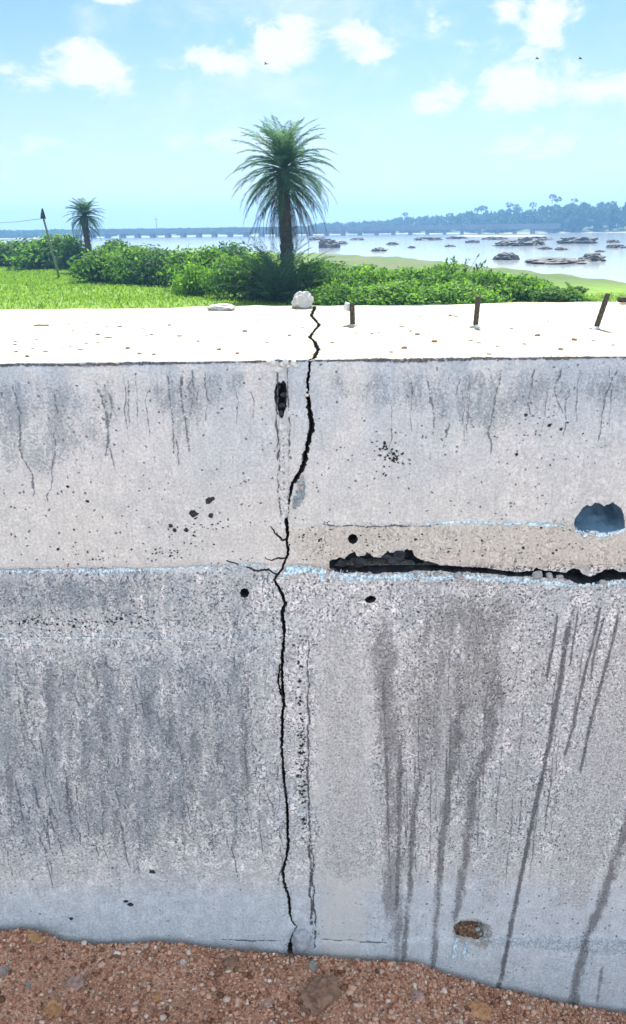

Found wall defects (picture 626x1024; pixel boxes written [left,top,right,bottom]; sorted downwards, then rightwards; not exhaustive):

spalling [266,358,300,418]
leakage [0,356,626,426]
spalling [288,520,626,586]
crack [222,306,386,953]
leakage [18,695,65,886]
leakage [63,763,130,866]
leakage [242,738,290,815]
leakage [373,628,504,969]
leakage [451,609,626,1005]